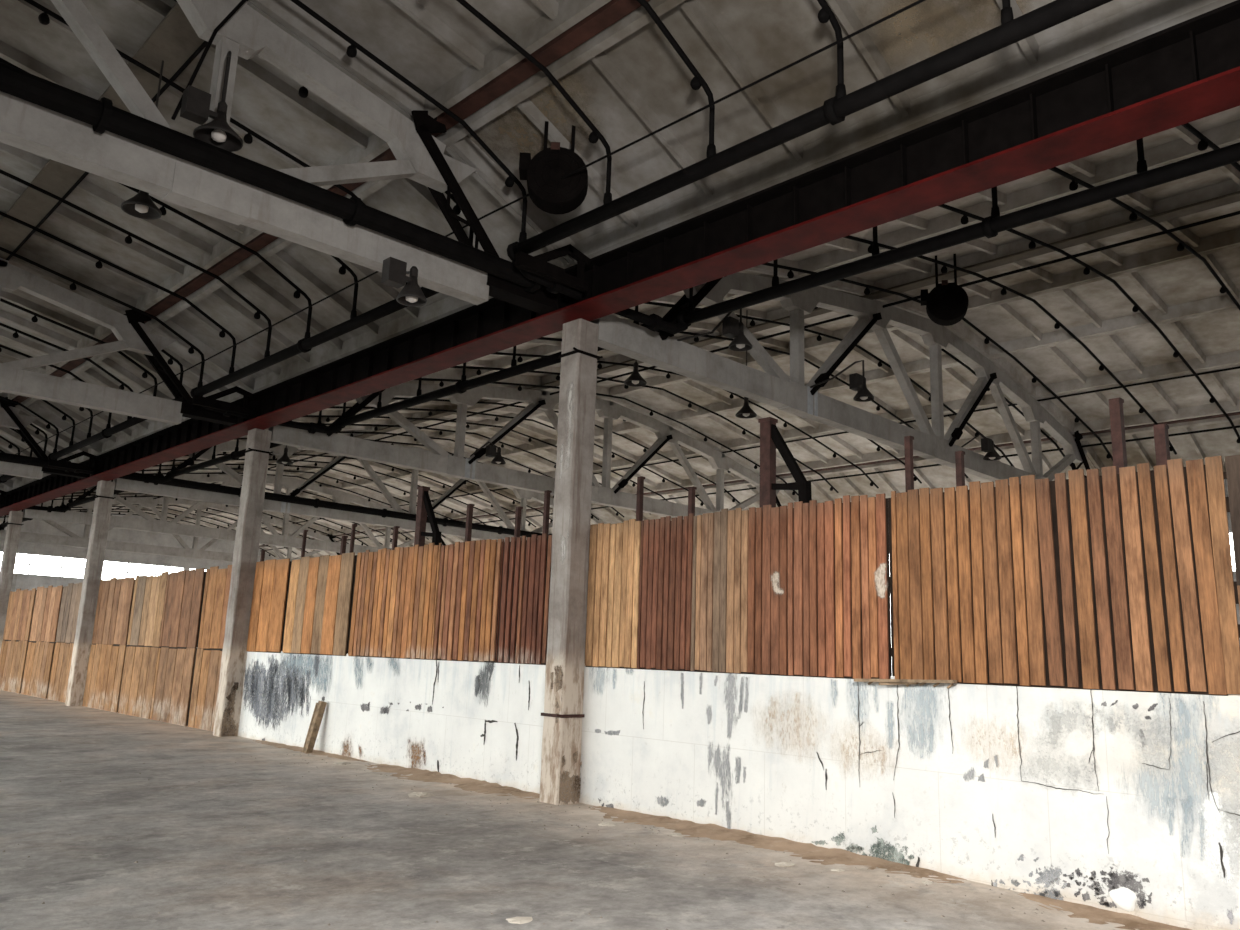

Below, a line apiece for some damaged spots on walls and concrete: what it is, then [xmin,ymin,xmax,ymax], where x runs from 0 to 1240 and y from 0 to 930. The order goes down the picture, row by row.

leakage [243,654,331,728]
leakage [831,680,937,751]
crack [1142,700,1172,770]
leakage [1109,693,1240,881]
crack [1203,701,1240,816]
peeling [812,825,914,865]
spalling [993,854,1152,909]
crack [1218,843,1226,878]